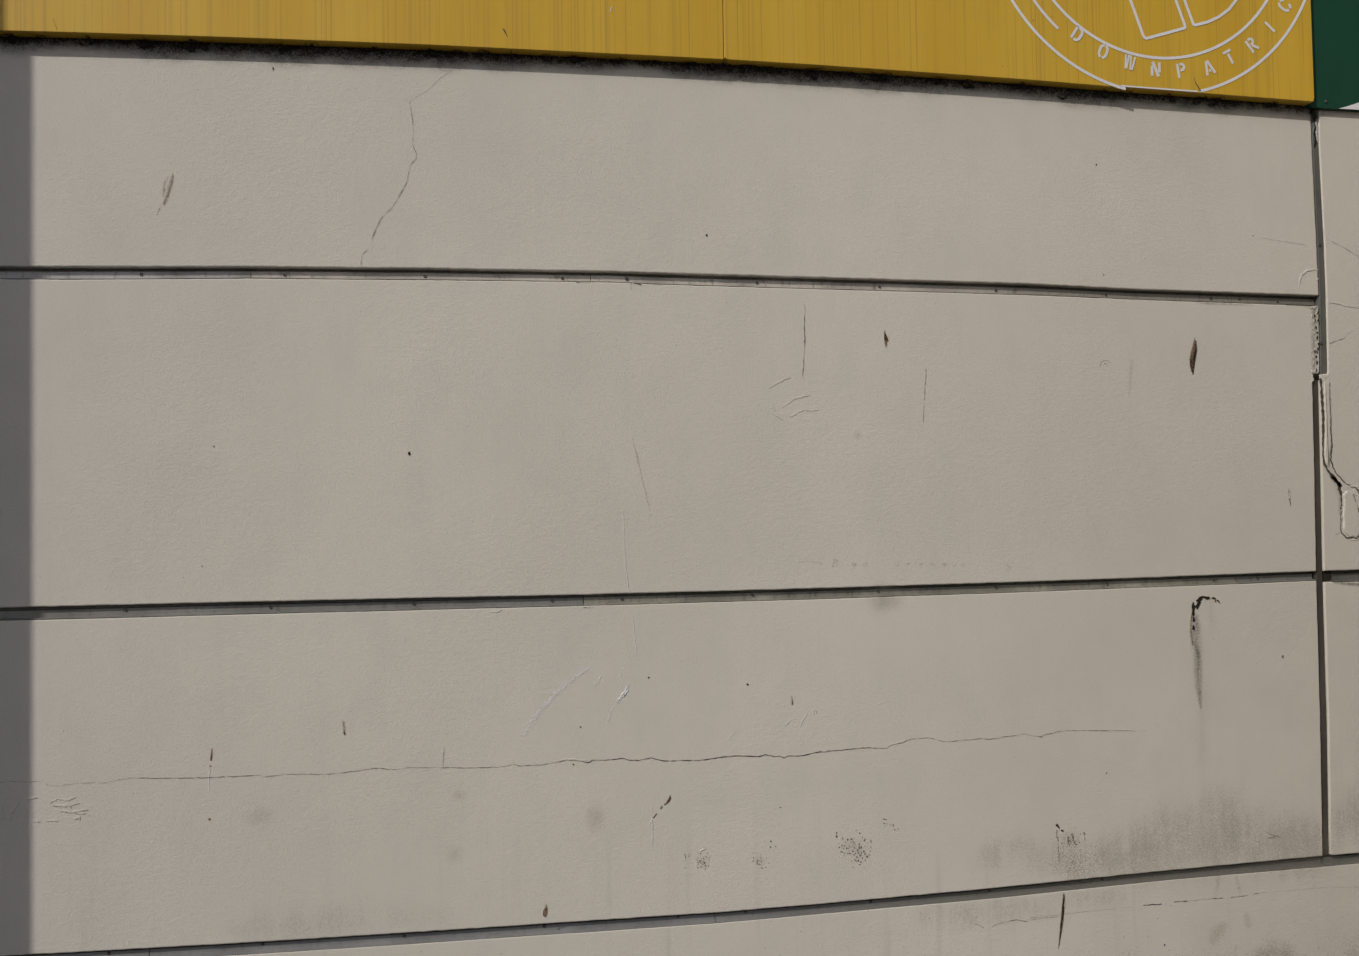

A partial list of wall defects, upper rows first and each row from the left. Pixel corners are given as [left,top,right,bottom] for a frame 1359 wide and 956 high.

crack [1319,378,1359,541]
crack [196,729,1146,778]